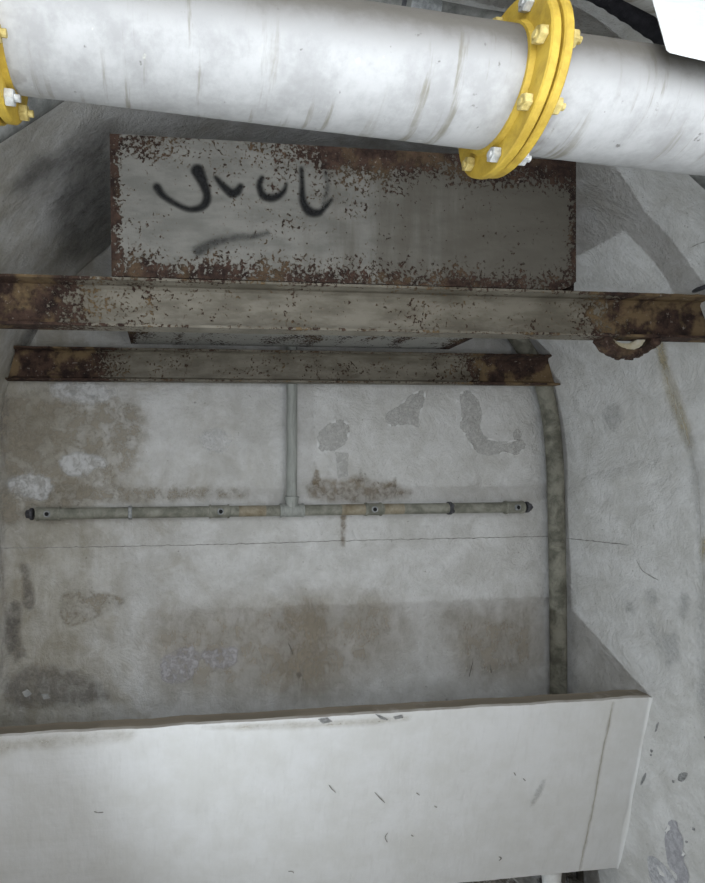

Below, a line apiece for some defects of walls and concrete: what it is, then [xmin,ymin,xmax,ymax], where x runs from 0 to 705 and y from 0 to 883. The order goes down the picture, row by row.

corrosion [599,342,643,360]
leakage [0,398,155,523]
peeling [647,820,689,883]